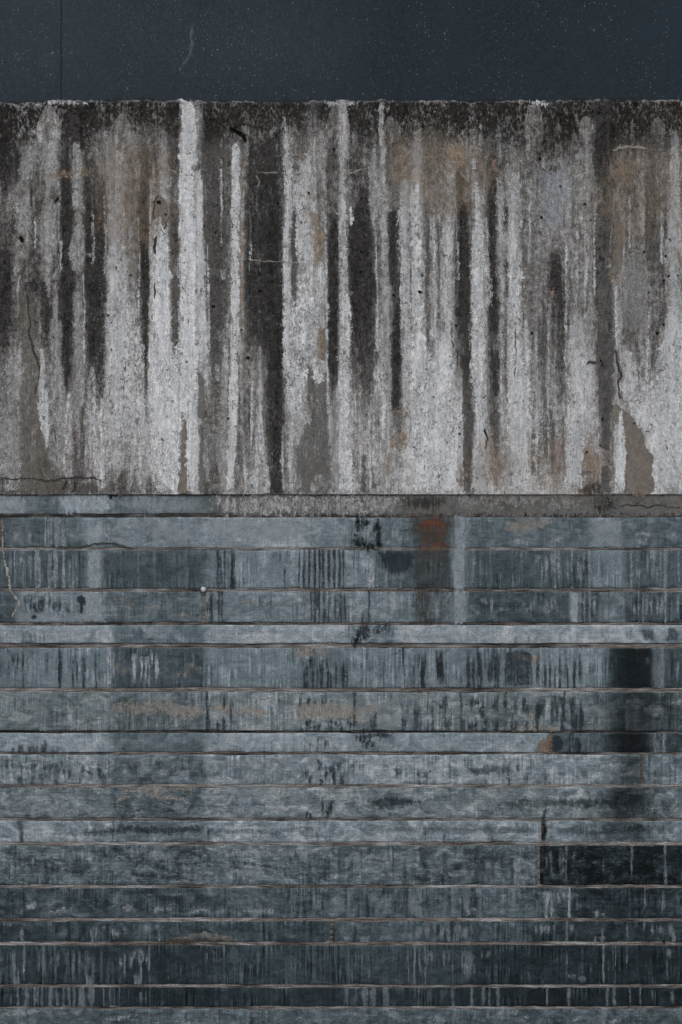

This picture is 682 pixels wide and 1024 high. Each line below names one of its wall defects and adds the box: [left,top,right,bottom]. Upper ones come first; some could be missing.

water stain [0,99,682,498]
peeling [611,350,655,495]
crack [1,521,20,617]
water stain [618,551,680,764]
water stain [505,788,643,817]